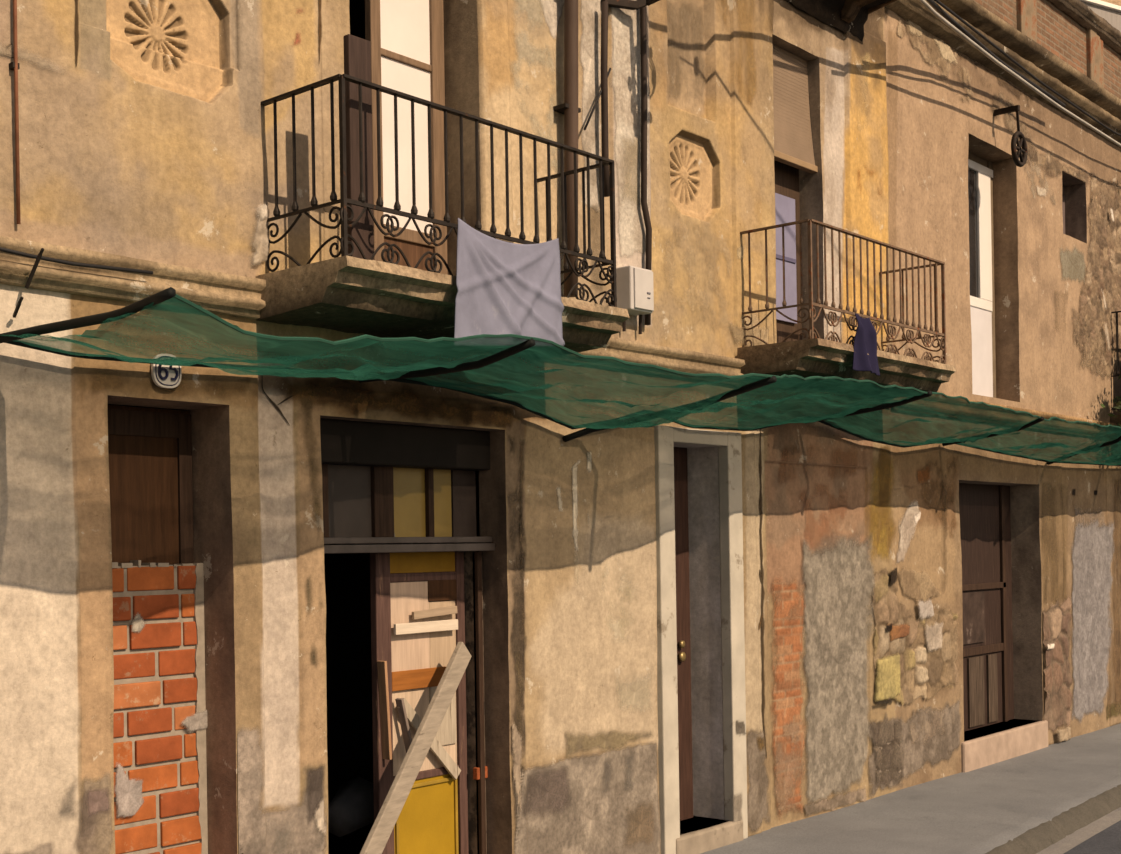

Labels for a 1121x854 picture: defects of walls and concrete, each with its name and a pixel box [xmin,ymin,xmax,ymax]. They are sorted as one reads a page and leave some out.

peeling [518,0,564,38]
peeling [580,0,649,287]
spalling [897,19,1121,377]
crack [262,375,292,426]
water stain [514,731,661,854]
spalling [772,581,805,815]
spalling [871,501,958,705]
water stain [868,701,961,795]